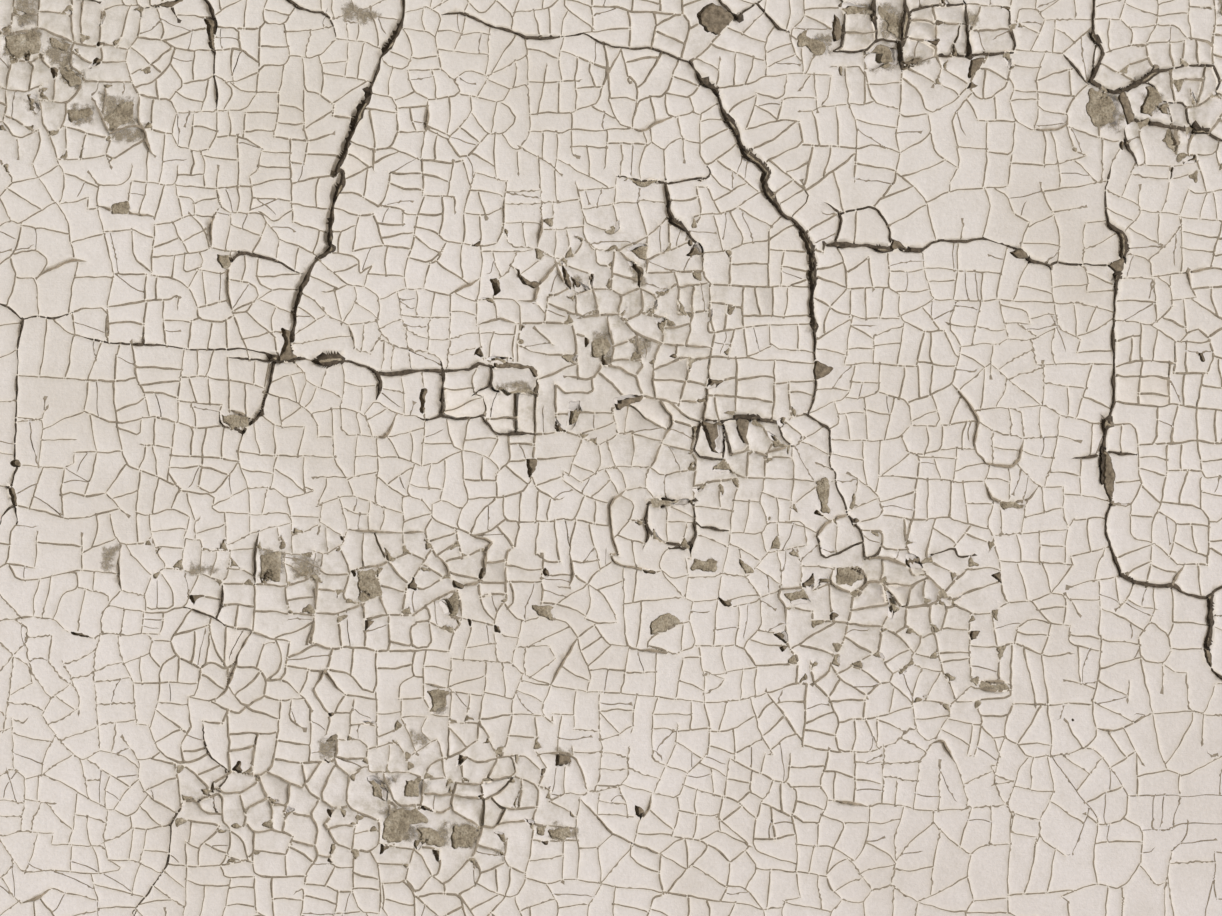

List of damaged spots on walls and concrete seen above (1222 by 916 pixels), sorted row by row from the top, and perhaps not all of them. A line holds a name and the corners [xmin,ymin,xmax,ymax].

peeling [0,0,120,130]
crack [25,0,222,220]
spalling [697,3,734,35]
peeling [832,2,985,89]
crack [833,0,1059,72]
peeling [1086,86,1198,183]
crack [1106,0,1222,166]
peeling [515,221,691,365]
crack [0,256,740,916]
crack [600,357,1015,916]
peeling [327,720,506,866]
crack [1130,659,1222,916]